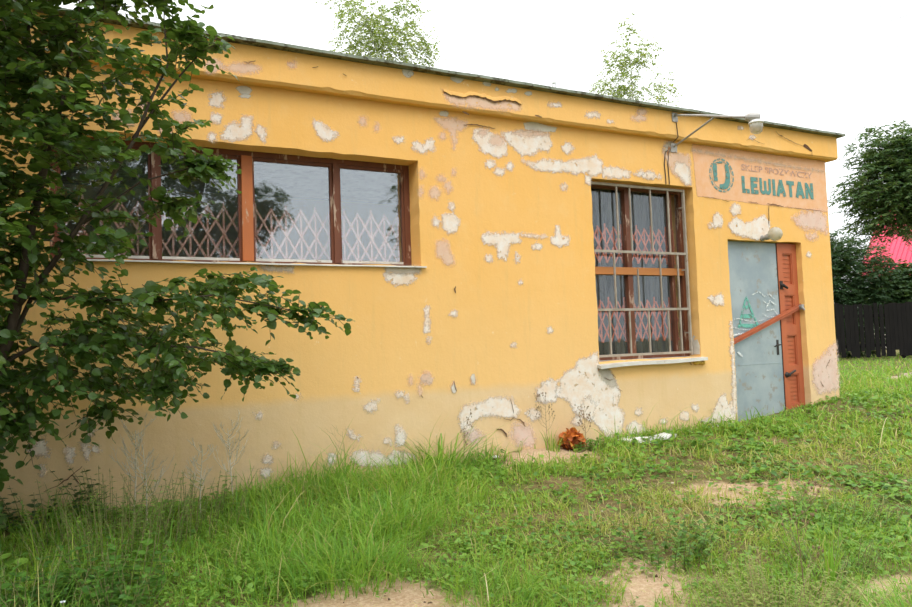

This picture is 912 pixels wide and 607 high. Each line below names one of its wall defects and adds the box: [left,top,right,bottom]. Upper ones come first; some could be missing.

peeling [205,59,259,73]
peeling [206,92,267,143]
peeling [313,119,339,142]
peeling [393,77,691,191]
peeling [419,169,460,265]
peeling [482,225,570,263]
peeling [708,203,770,240]
peeling [794,210,828,240]
peeling [383,272,417,287]
peeling [458,351,648,447]
peeling [679,321,737,428]
peeling [812,343,840,394]